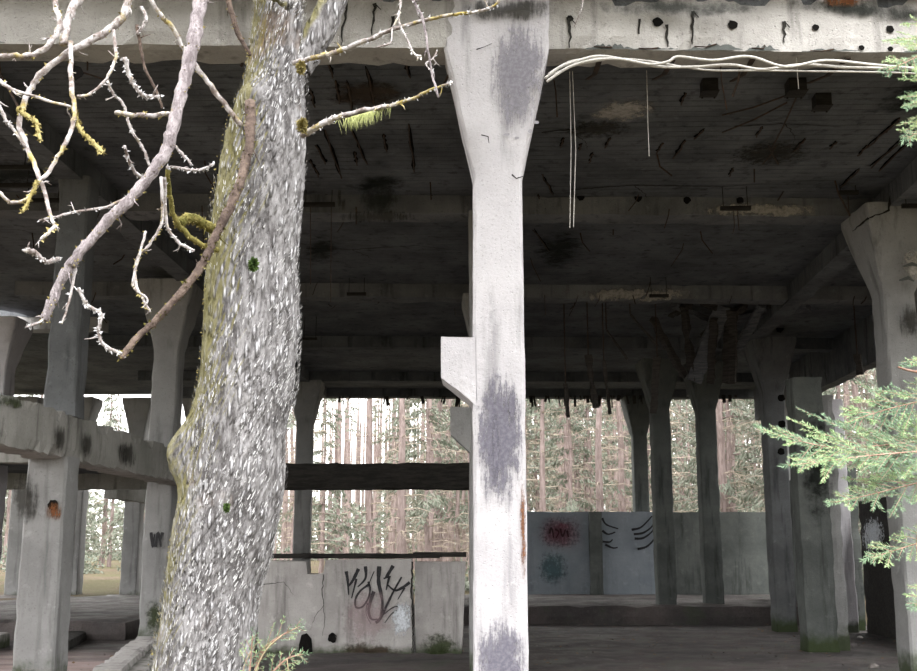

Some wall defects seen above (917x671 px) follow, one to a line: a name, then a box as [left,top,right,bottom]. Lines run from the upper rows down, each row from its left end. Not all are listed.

spalling [586,43,778,51]
crack [853,197,891,231]
damp [56,426,65,449]
damp [119,444,136,466]
rust [47,503,61,518]